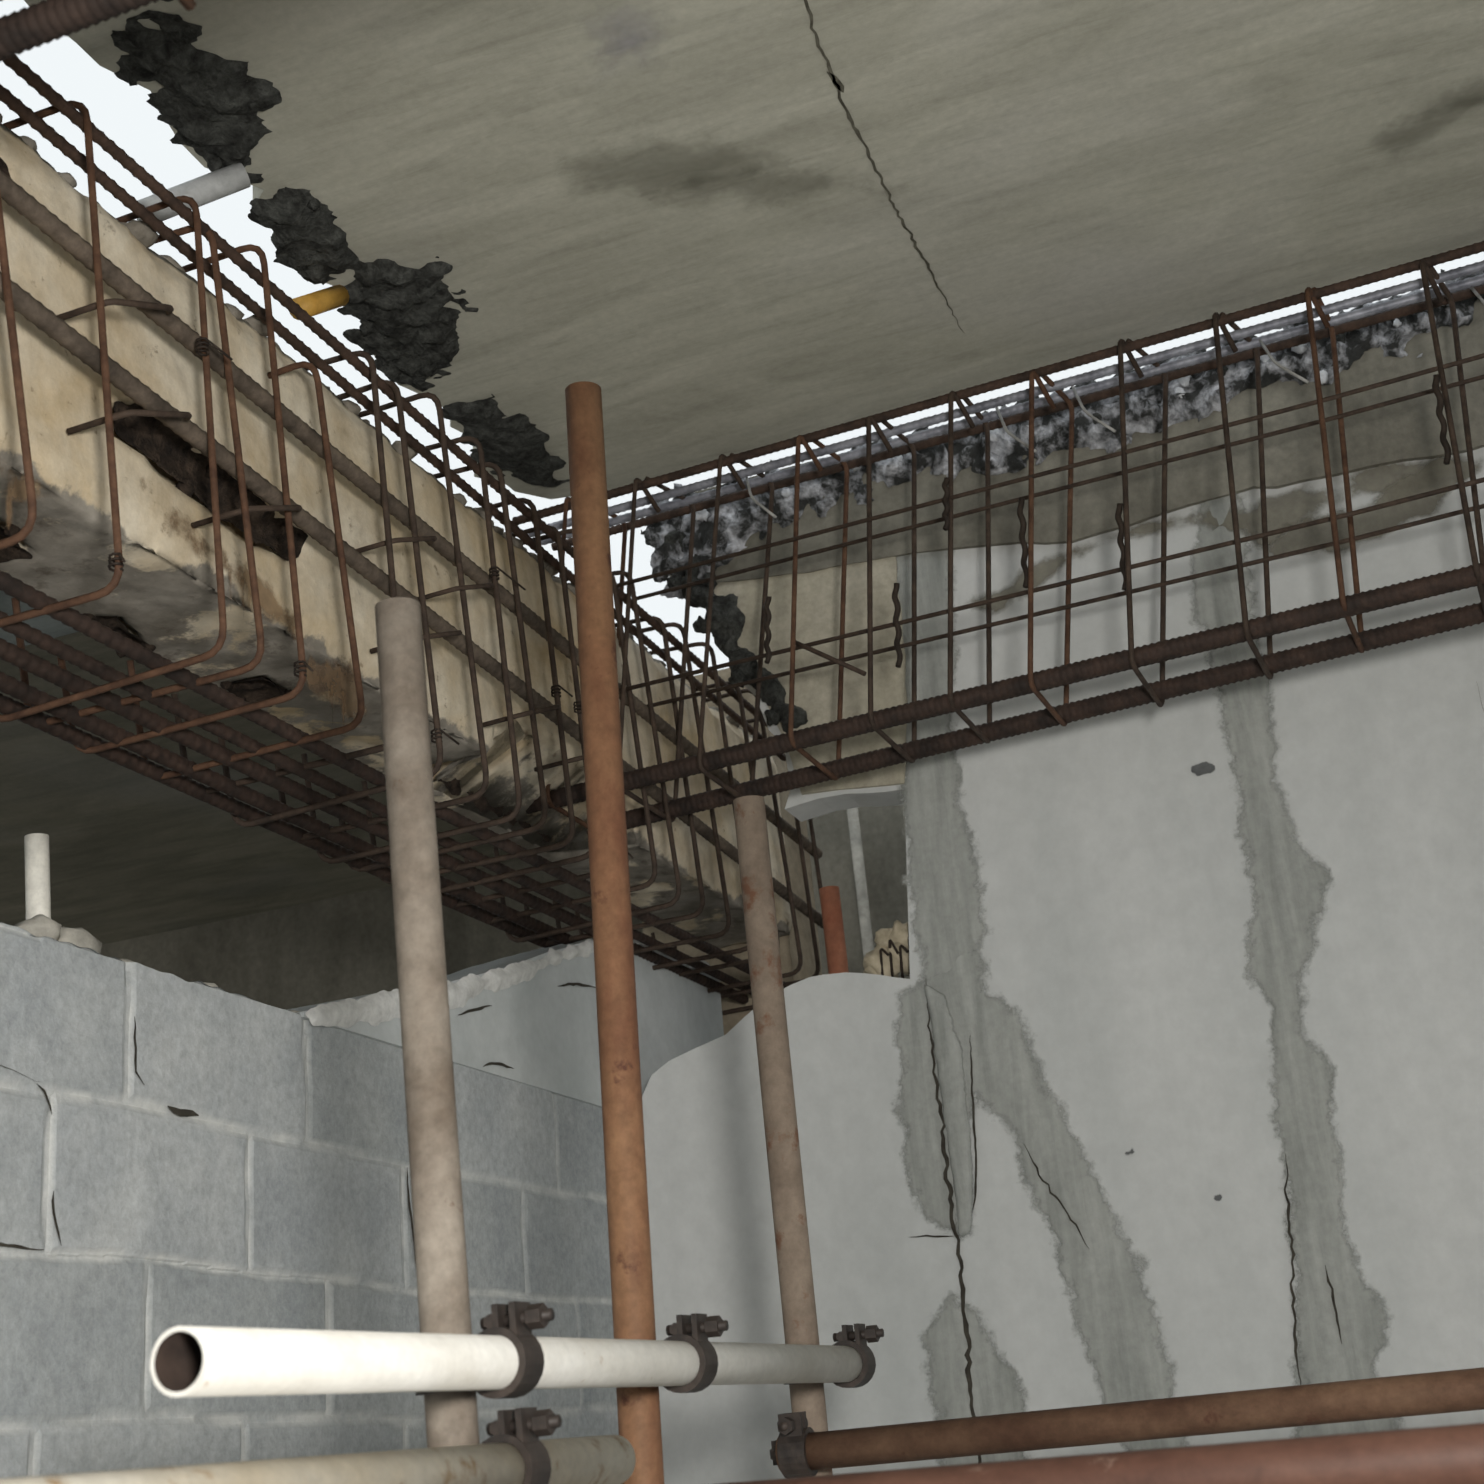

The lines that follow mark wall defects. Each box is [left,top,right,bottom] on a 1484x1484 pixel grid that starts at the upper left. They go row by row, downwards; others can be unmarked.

spalling [0,158,10,177]
spalling [111,0,479,392]
crack [804,0,963,331]
spalling [0,524,33,563]
spalling [113,401,308,561]
spalling [442,394,570,487]
spalling [641,269,1484,733]
spalling [83,613,156,658]
spalling [220,677,292,707]
crack [0,1065,52,1113]
crack [914,1001,977,1417]
crack [1023,1143,1088,1247]